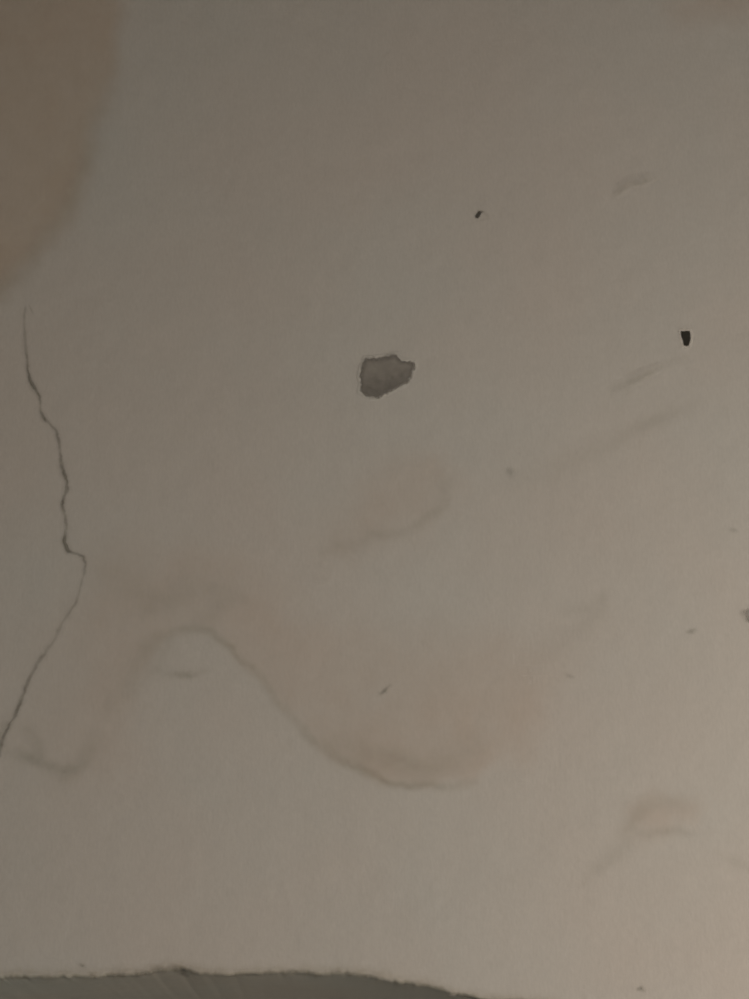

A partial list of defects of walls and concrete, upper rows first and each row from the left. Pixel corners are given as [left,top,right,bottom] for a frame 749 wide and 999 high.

spalling [681,331,691,346]
crack [28,371,46,421]
peeling [356,351,418,401]